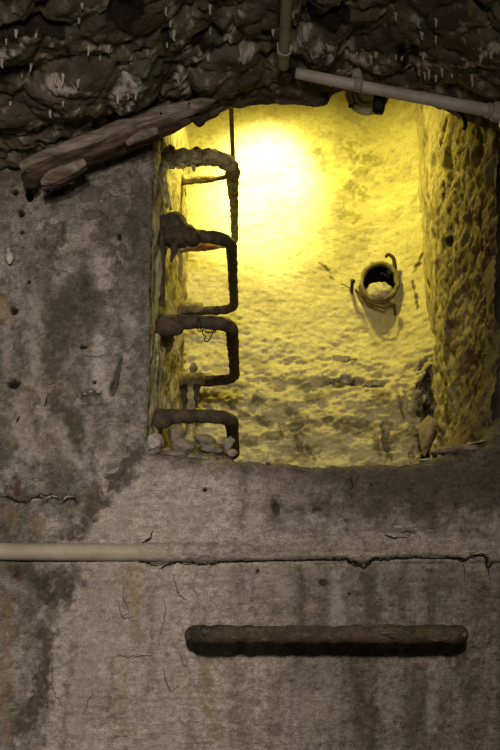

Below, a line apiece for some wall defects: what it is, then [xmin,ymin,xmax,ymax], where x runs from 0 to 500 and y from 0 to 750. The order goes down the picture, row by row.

leakage [93,254,113,289]
efflorescence [93,336,111,398]
crack [0,493,78,504]
leakage [67,447,144,540]
leakage [11,564,87,735]
crack [118,530,500,692]